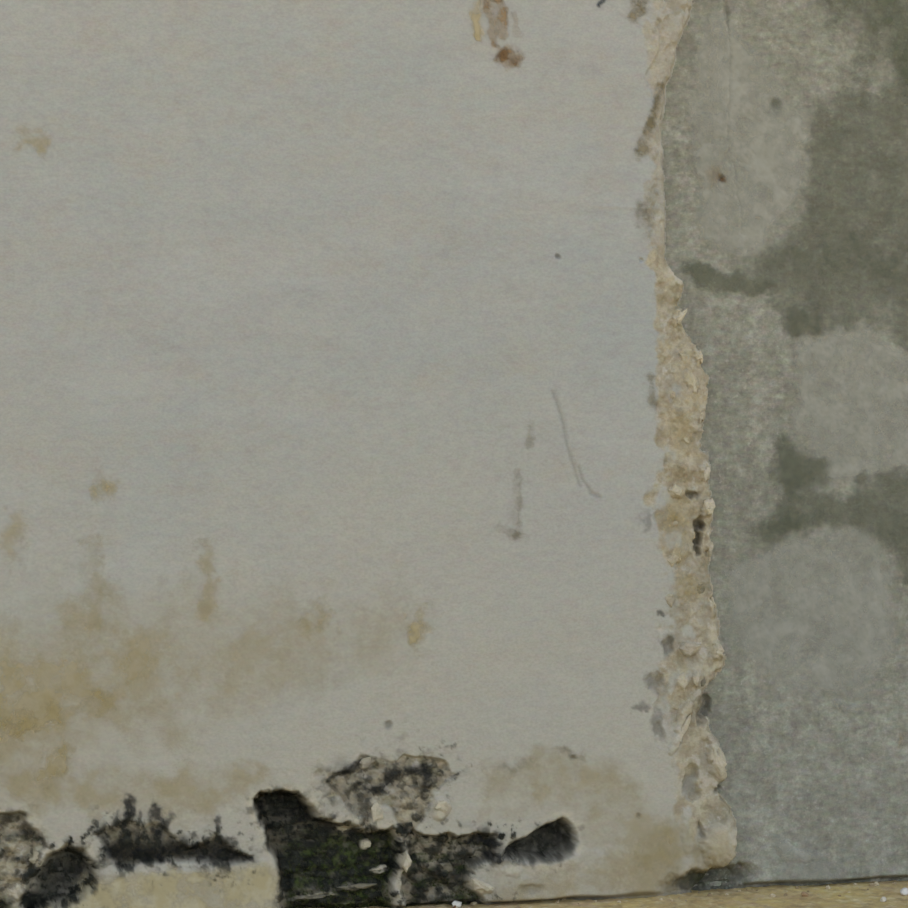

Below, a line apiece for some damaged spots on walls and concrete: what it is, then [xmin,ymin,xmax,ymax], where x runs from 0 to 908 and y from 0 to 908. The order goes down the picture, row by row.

corrosion [471,0,507,41]
corrosion [492,40,517,65]
leakage [695,29,807,254]
leakage [684,262,771,296]
peeling [629,0,908,891]
leakage [733,316,908,688]
spalling [0,752,580,908]
leakage [326,759,444,800]